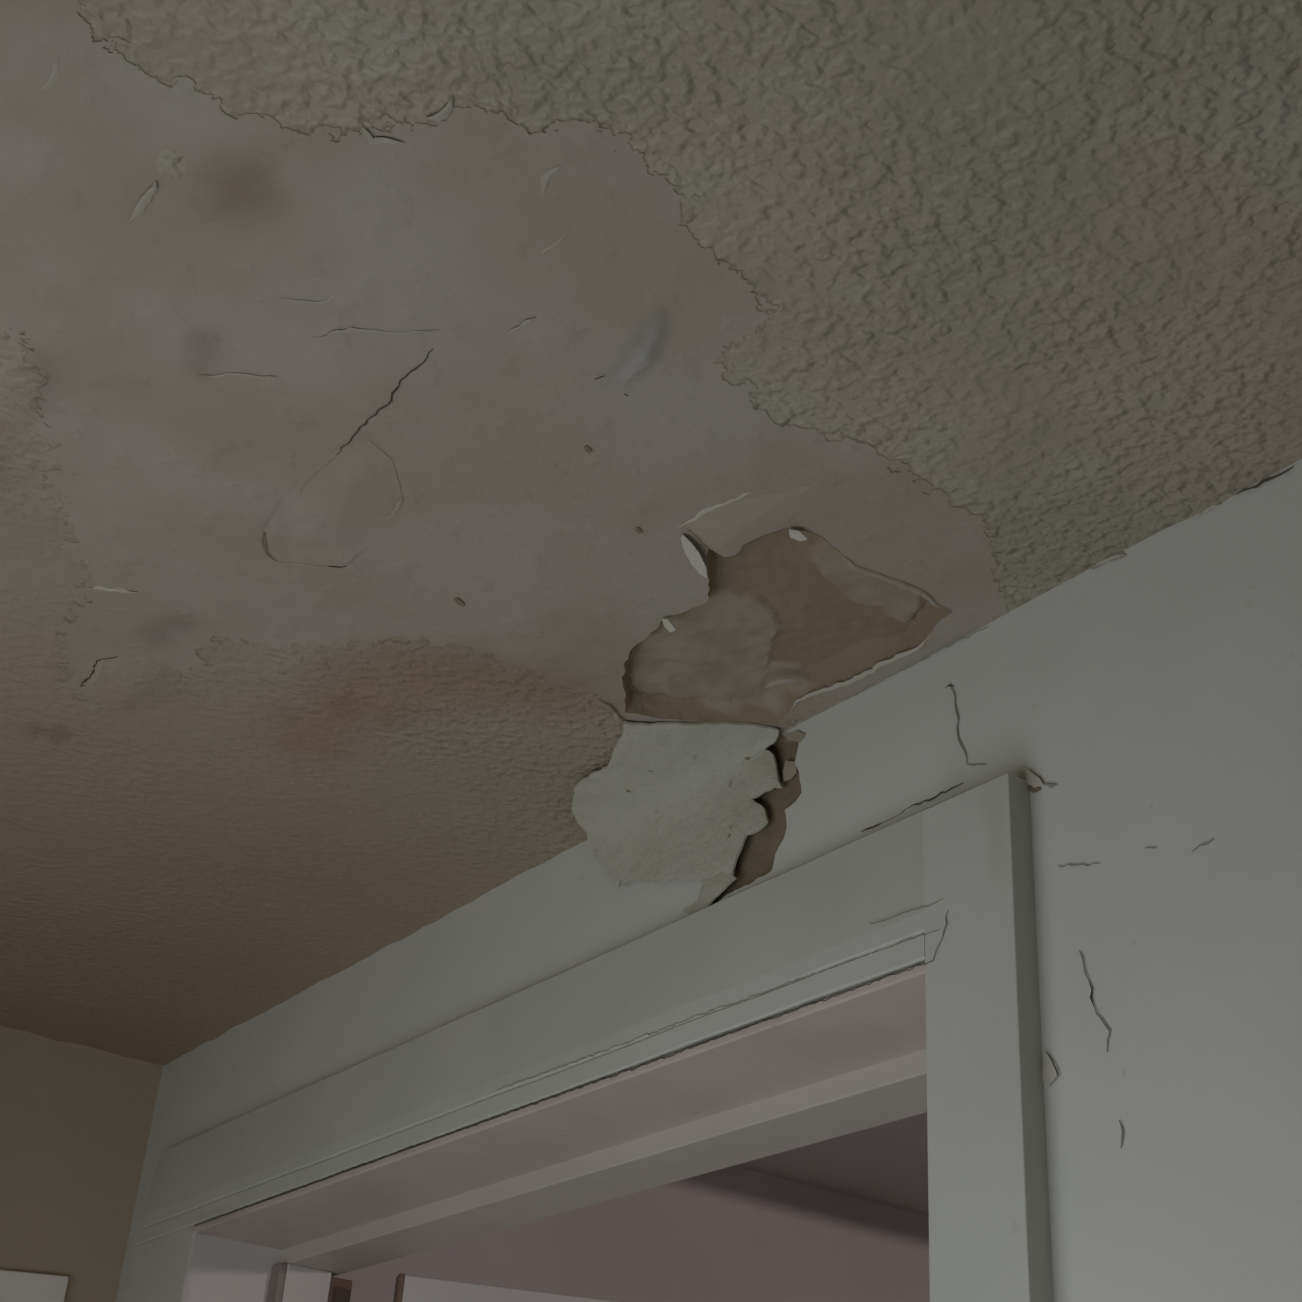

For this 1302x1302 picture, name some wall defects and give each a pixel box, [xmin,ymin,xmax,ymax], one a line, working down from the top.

crack [291,349,433,506]
peeling [0,0,1015,914]
crack [1198,466,1294,517]
crack [80,656,118,687]
crack [845,626,988,700]
crack [861,684,986,832]
crack [1079,951,1110,1052]